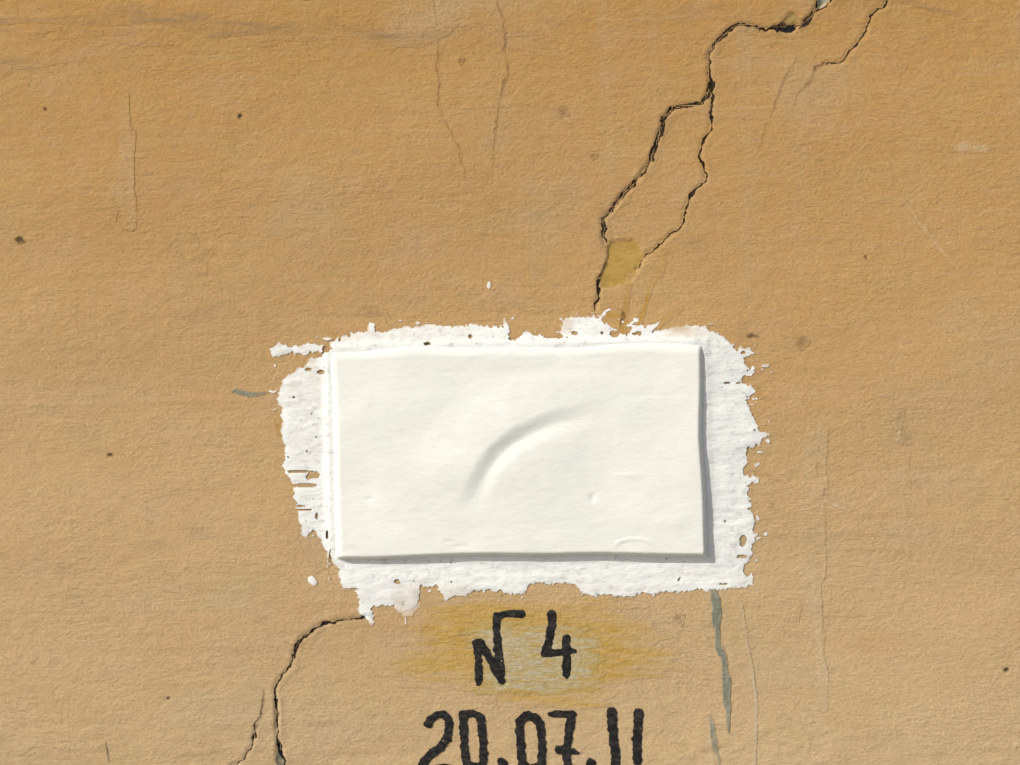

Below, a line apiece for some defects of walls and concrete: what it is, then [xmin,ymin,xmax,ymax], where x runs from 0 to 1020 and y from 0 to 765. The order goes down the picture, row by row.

crack [594,0,888,311]
crack [226,614,369,765]